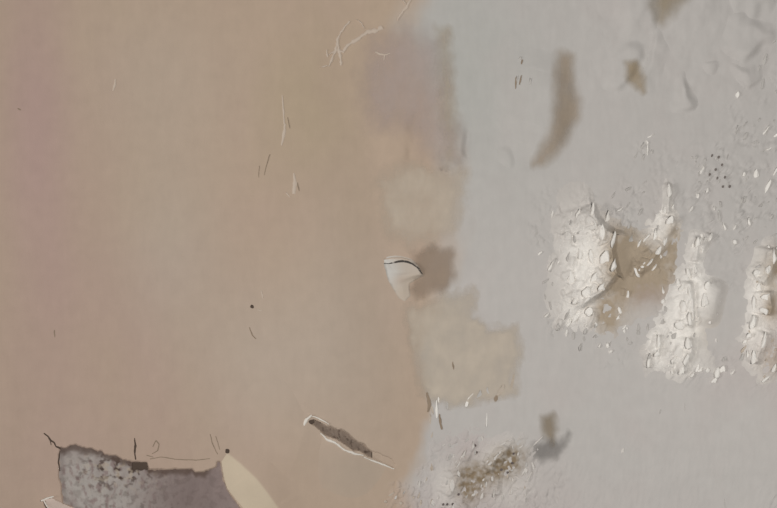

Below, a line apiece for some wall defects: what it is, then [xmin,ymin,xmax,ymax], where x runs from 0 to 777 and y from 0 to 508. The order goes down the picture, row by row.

leakage [414,247,451,294]
flaking render [538,178,777,386]
leakage [408,295,518,405]
peeling [41,380,544,508]